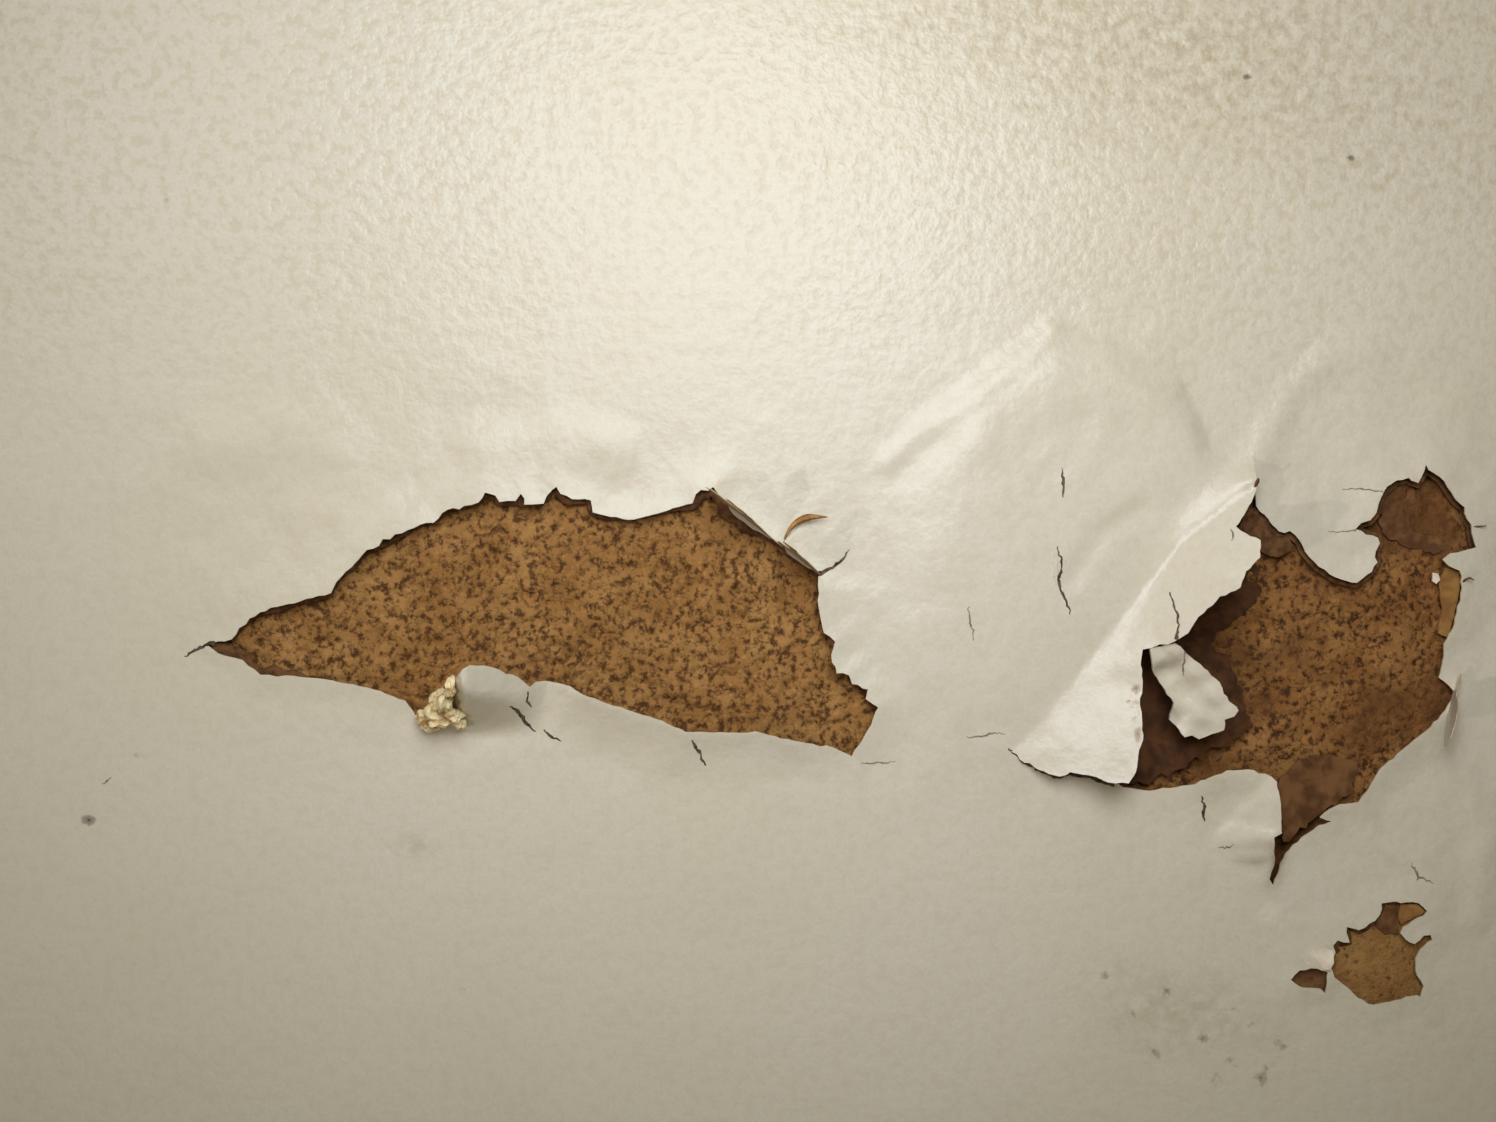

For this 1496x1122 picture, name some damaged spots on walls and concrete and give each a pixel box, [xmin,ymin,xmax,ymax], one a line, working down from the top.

peeling [113,487,878,830]
peeling [949,466,1496,1079]